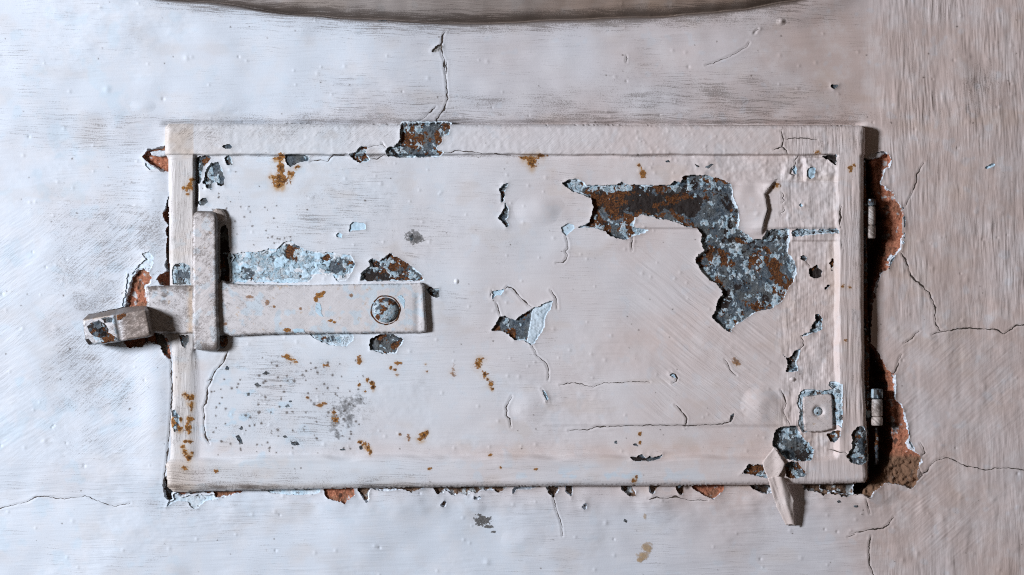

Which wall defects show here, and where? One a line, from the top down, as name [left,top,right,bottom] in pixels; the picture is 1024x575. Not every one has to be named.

crack [419,32,448,122]
corrosion [268,152,300,188]
peeling [385,121,452,158]
peeling [220,225,440,298]
peeling [561,164,840,332]
flaking render [772,151,923,497]
crack [893,253,1024,374]
crack [0,495,125,509]
corrosion [171,392,194,470]
flaking render [266,486,573,507]
crack [917,446,1022,480]
crack [849,505,893,575]